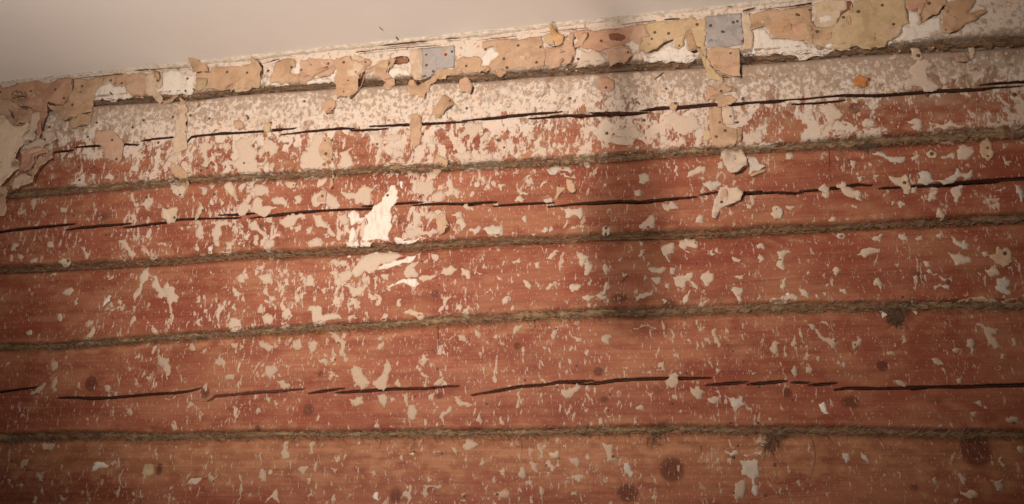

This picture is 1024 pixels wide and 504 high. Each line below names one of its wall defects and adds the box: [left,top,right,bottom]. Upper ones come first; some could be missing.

peeling [905,59,940,92]
crack [54,80,1024,153]
peeling [451,122,538,165]
peeling [195,133,376,254]
crack [0,191,718,233]
peeling [405,180,517,239]
peeling [540,166,576,203]
peeling [564,207,584,234]
peeling [674,161,724,191]
crack [744,176,1024,195]
peeling [818,144,974,208]
crack [0,356,1024,402]